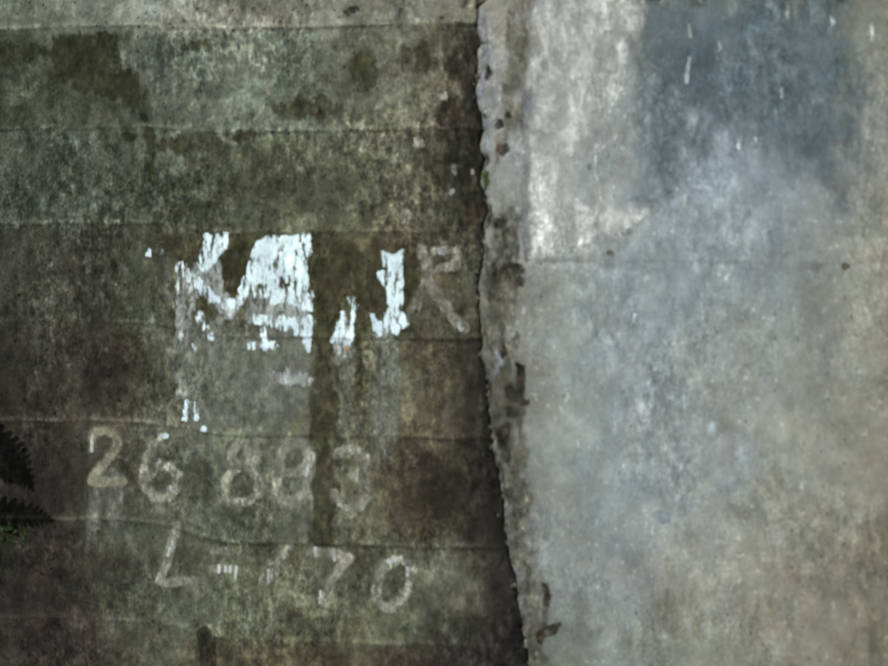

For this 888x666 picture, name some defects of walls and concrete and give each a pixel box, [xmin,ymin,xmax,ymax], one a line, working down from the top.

water stain [639,0,863,193]
peeling [175,259,313,349]
peeling [333,315,349,360]